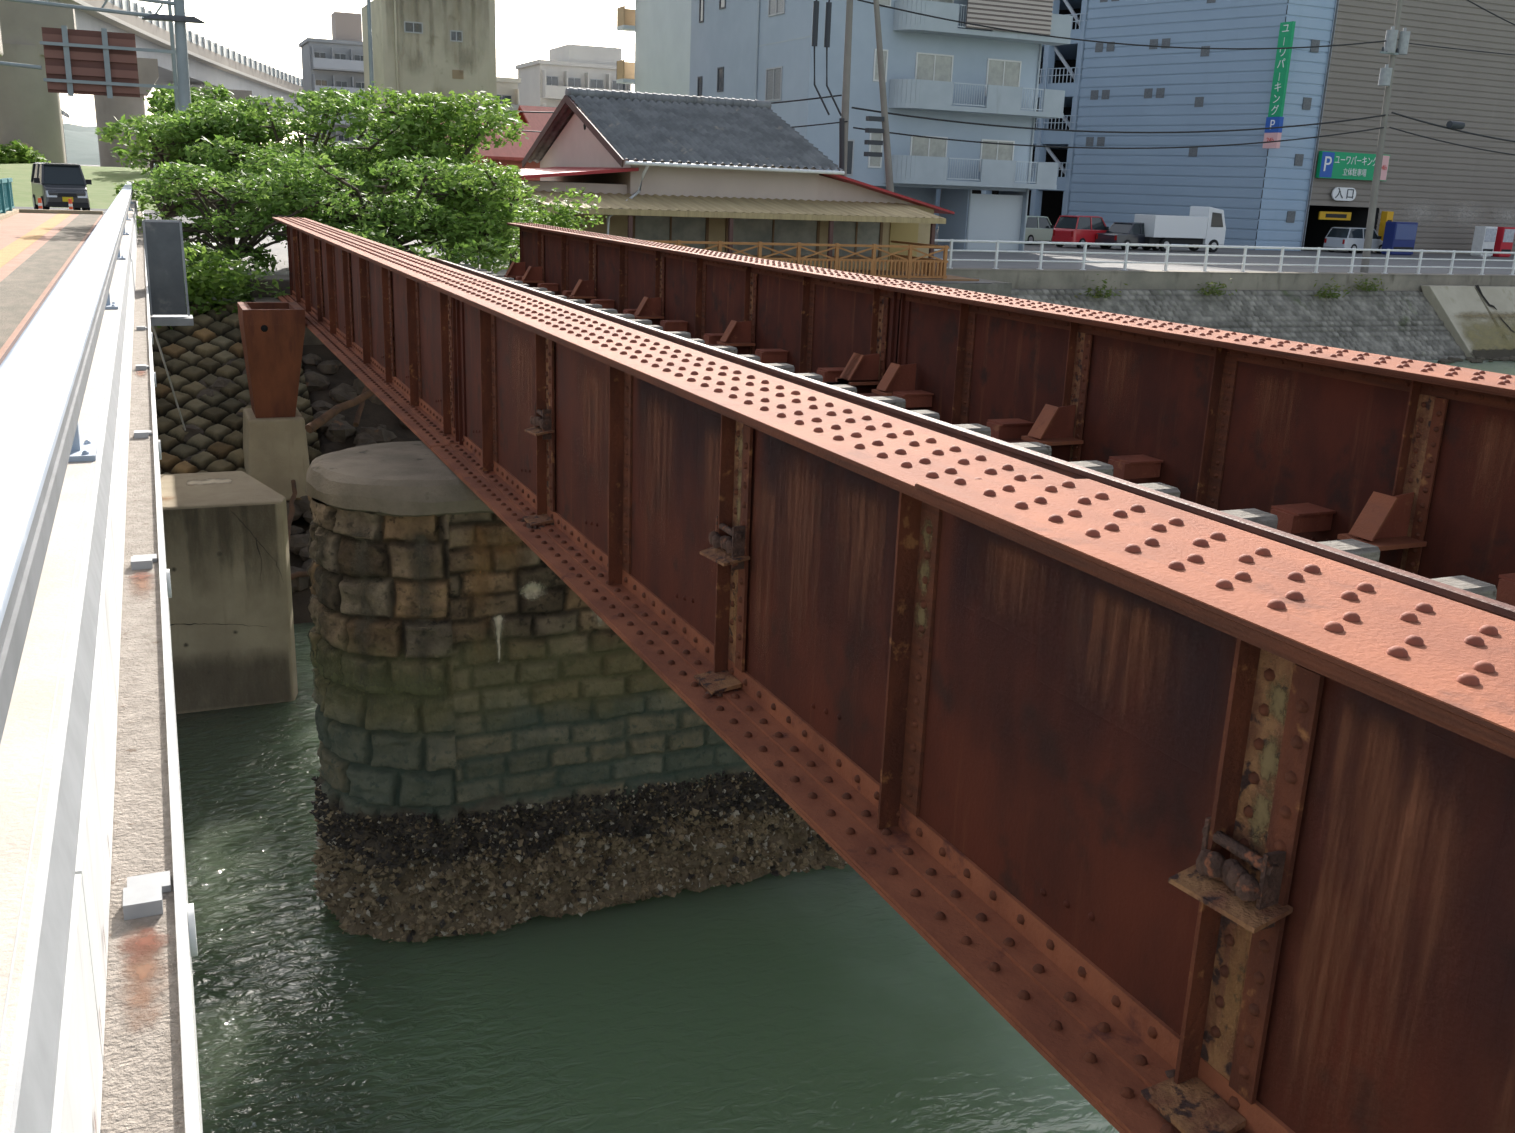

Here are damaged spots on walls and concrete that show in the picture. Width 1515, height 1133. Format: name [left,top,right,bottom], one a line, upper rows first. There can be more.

peeling [1249,682,1289,844]